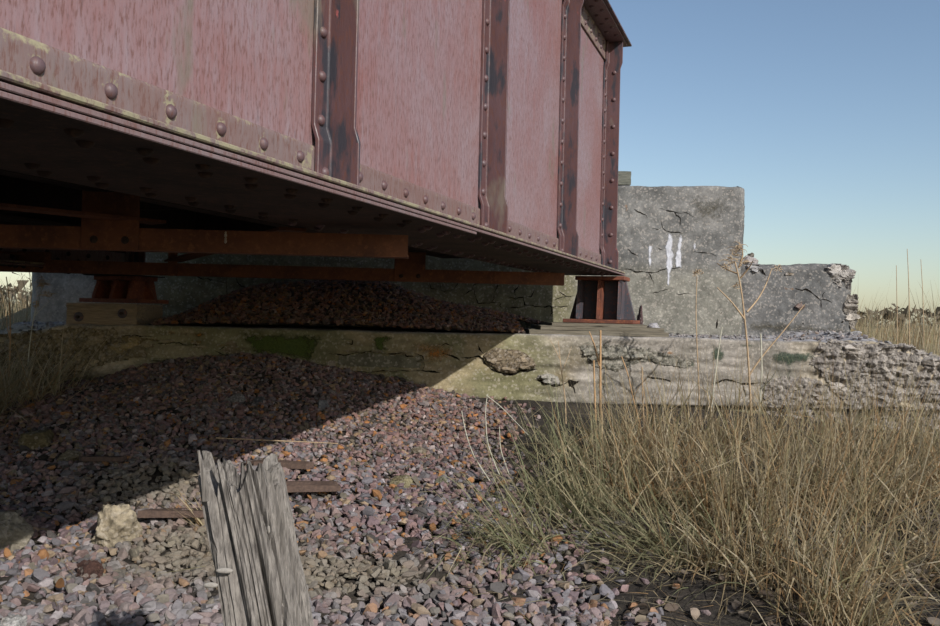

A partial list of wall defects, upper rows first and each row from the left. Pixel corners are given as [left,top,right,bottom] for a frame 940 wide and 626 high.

crack [628,208,714,295]
water stain [666,234,682,284]
crack [430,283,571,316]
spalling [825,263,861,330]
crack [329,339,578,391]
spalling [762,339,940,434]